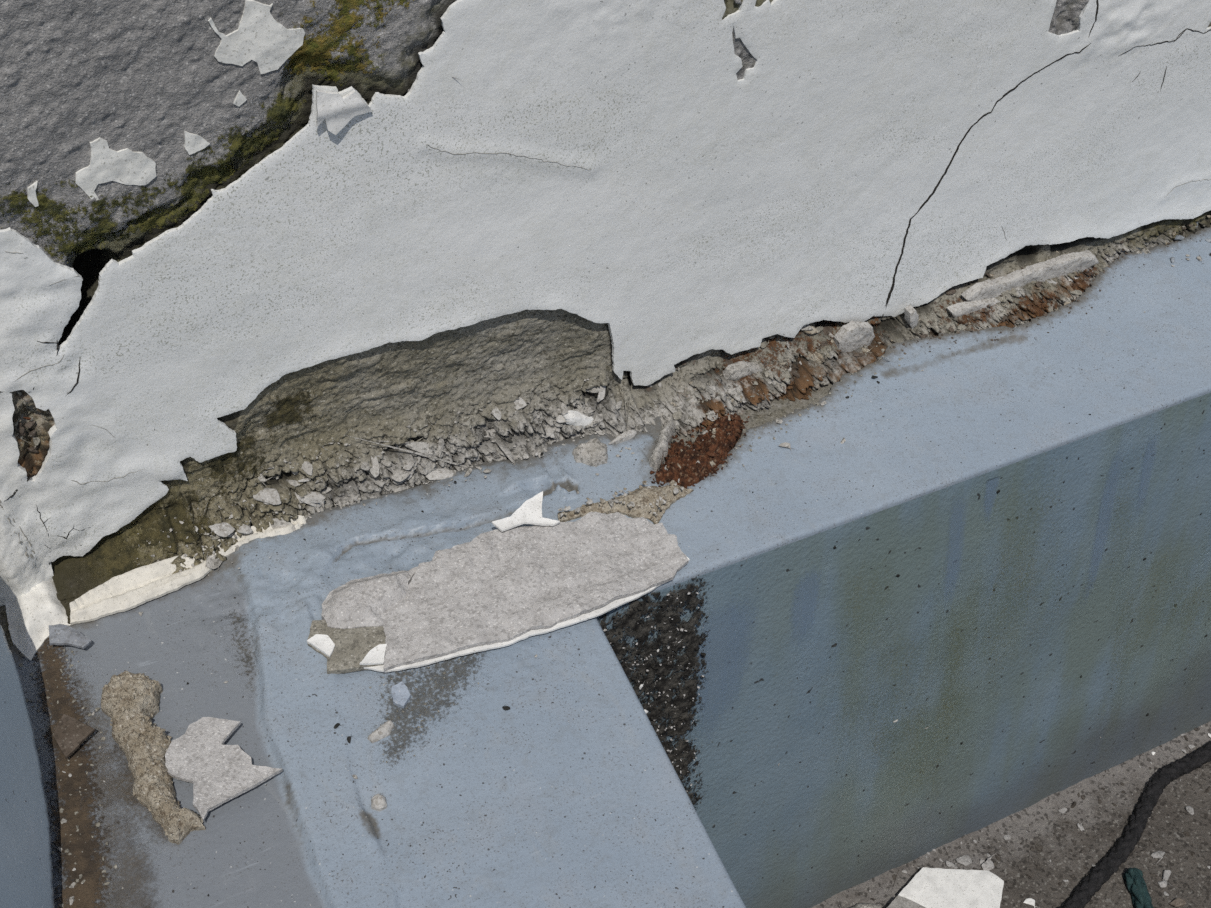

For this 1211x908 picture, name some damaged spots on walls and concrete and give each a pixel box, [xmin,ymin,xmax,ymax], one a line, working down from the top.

spalling [718,0,773,80]
spalling [1048,0,1090,35]
crack [1119,28,1211,92]
spalling [0,0,457,346]
crack [881,0,1099,318]
spalling [12,390,55,477]
spalling [51,222,1156,625]
corrosion [650,406,749,489]